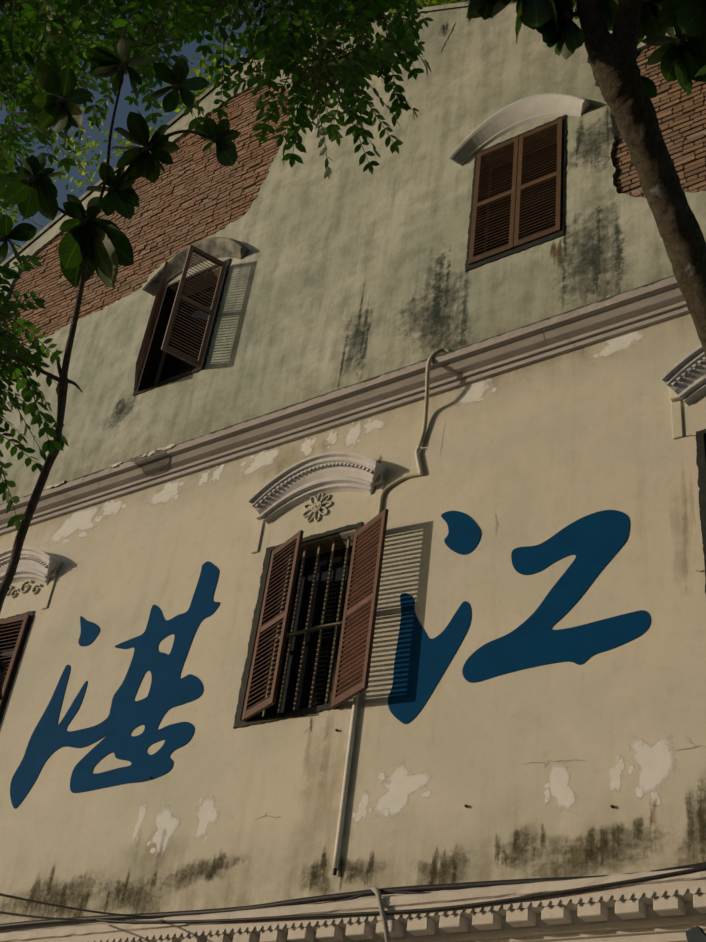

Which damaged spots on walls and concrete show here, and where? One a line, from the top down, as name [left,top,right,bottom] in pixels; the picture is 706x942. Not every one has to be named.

water stain [563,209,622,296]
water stain [410,261,467,355]
peeling [593,330,645,359]
peeling [300,419,385,456]
peeling [48,499,126,544]
peeling [353,763,432,823]
peeling [608,737,674,806]
water stain [14,869,90,918]
peeling [132,802,180,856]
water stain [175,854,235,887]
water stain [496,831,544,863]
water stain [553,819,652,877]